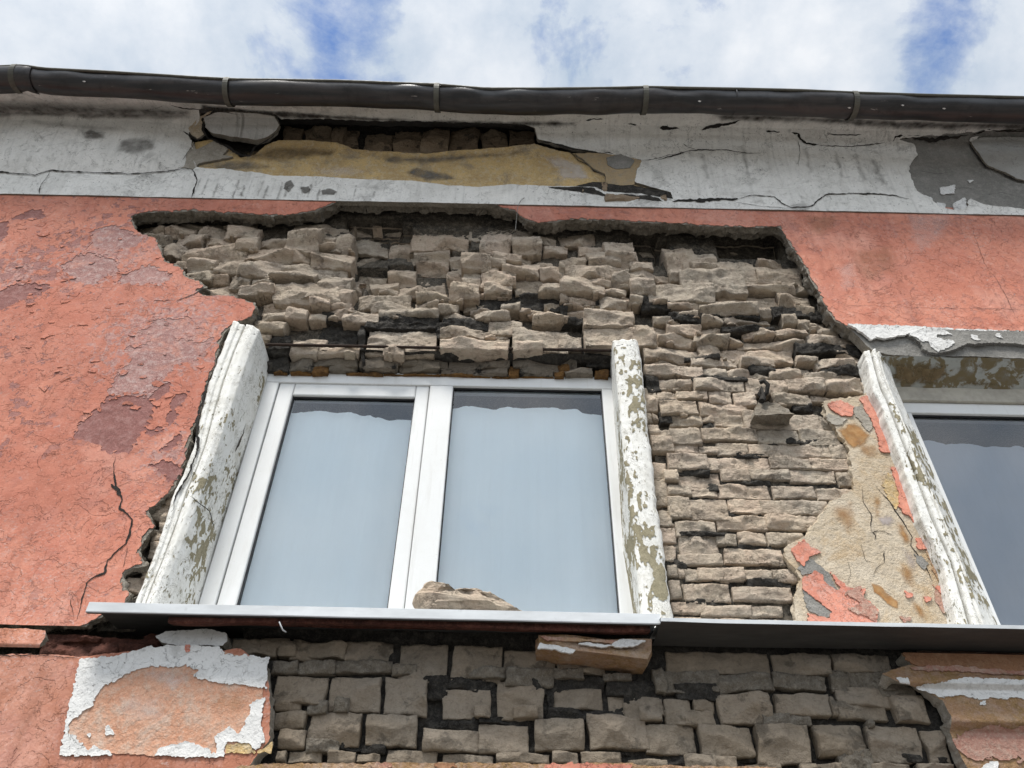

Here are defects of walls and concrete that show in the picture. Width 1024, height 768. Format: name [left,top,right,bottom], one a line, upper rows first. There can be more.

spalling [180,111,673,202]
crack [672,193,909,208]
crack [766,129,1024,196]
peeling [900,129,1024,211]
spalling [0,209,1024,625]
crack [70,455,133,617]
spalling [39,621,1024,768]